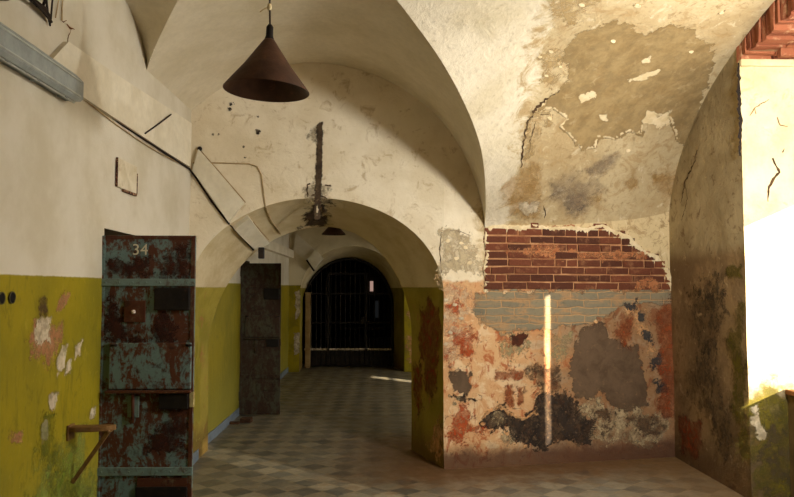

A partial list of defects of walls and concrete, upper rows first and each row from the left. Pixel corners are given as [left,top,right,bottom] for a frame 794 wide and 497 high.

peeling [538,0,716,151]
crack [767,149,784,198]
damp [297,200,336,229]
damp [518,201,546,218]
peeling [24,290,83,377]
spalling [404,223,671,416]
damp [684,272,734,465]
peeling [48,392,58,411]
peeling [425,420,443,464]
peeling [479,388,673,452]